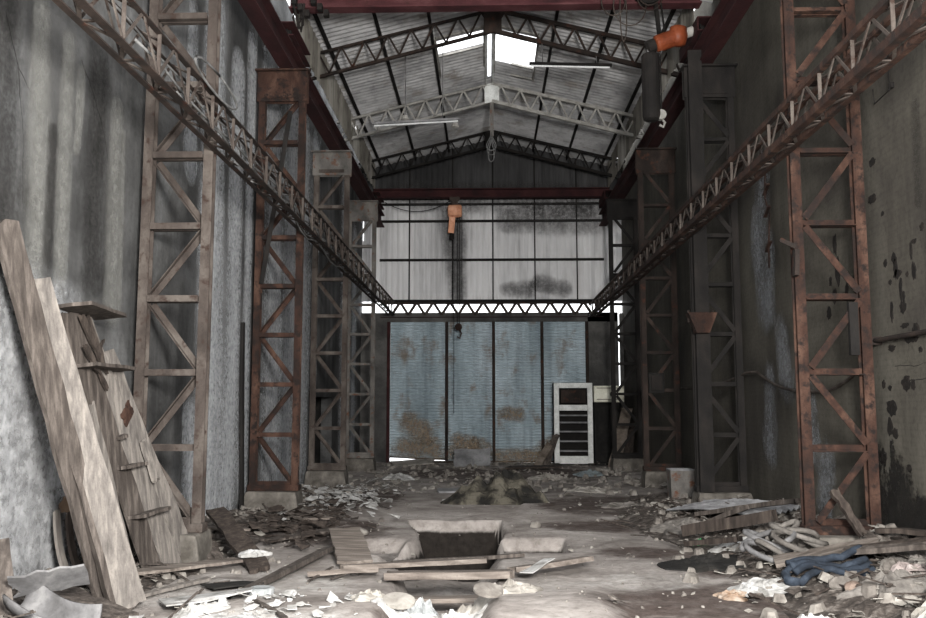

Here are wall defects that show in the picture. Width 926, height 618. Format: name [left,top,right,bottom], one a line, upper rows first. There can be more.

damp [28,0,125,320]
damp [444,218,465,299]
damp [458,198,598,230]
damp [751,173,793,465]
spalling [883,222,924,353]
damp [0,287,83,576]
corrosion [392,412,551,463]
damp [878,439,926,538]